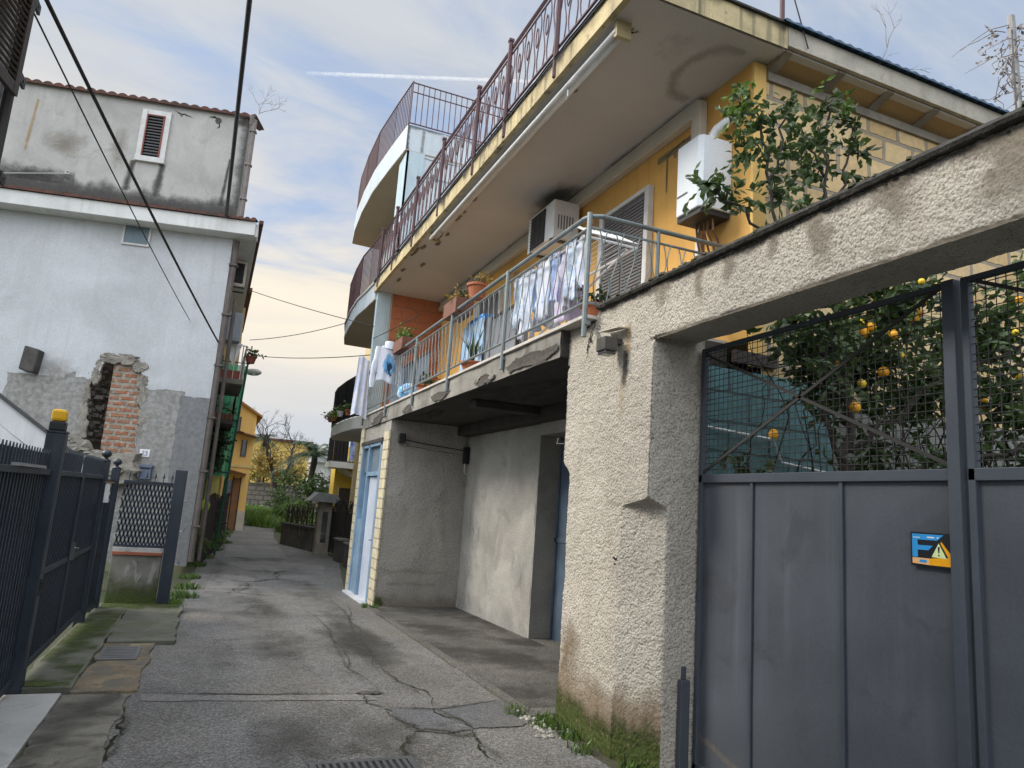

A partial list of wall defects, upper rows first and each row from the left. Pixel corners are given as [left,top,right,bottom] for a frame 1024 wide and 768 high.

water stain [0,118,250,216]
spalling [474,343,558,386]
peeling [2,352,185,563]
water stain [557,672,661,765]